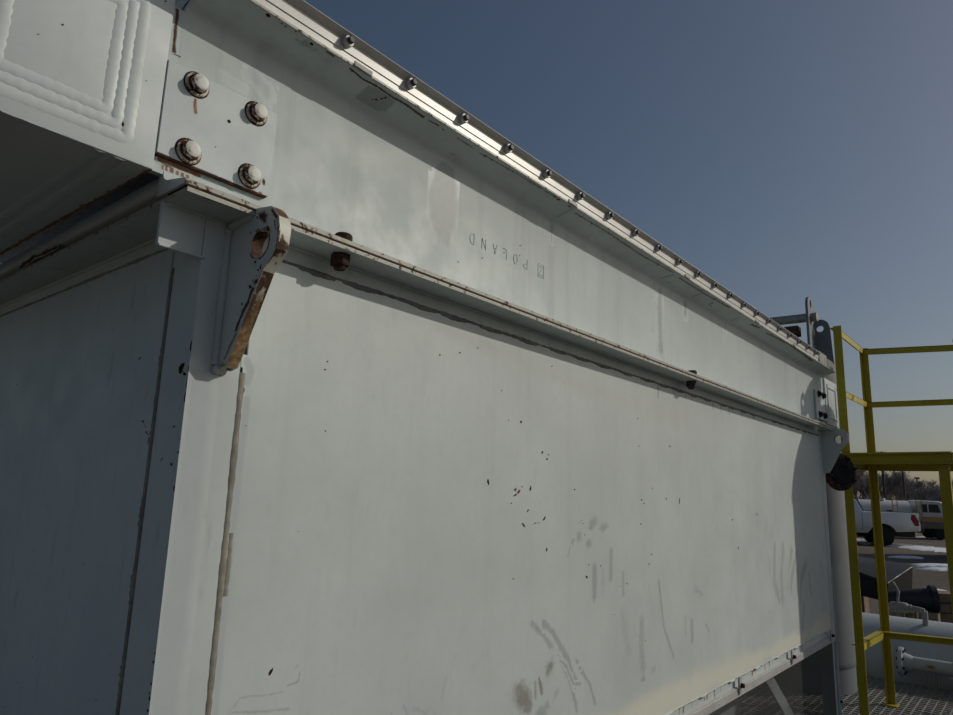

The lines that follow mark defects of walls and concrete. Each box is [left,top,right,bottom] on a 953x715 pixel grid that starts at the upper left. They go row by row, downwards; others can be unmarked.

corrosion [0,152,289,369]